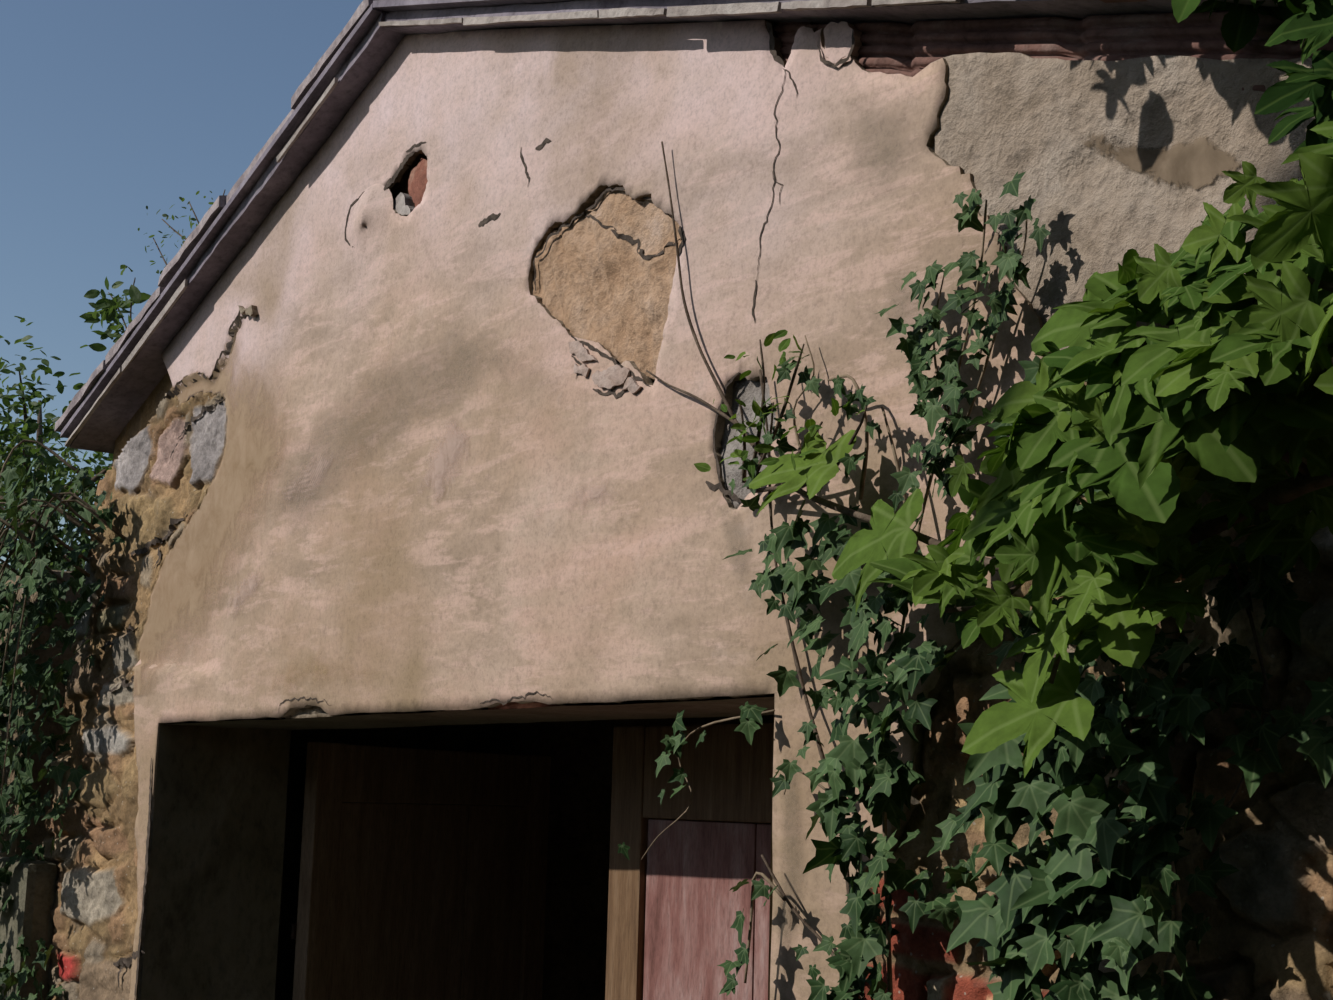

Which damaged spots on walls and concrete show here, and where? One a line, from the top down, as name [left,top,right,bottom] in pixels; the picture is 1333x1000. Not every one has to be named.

peeling [766,21,862,68]
spalling [384,152,415,191]
crack [520,138,551,187]
crack [752,69,798,322]
spalling [930,52,1315,326]
spalling [532,186,685,399]
peeling [133,305,281,695]
spalling [713,372,776,509]
spalling [278,696,341,719]